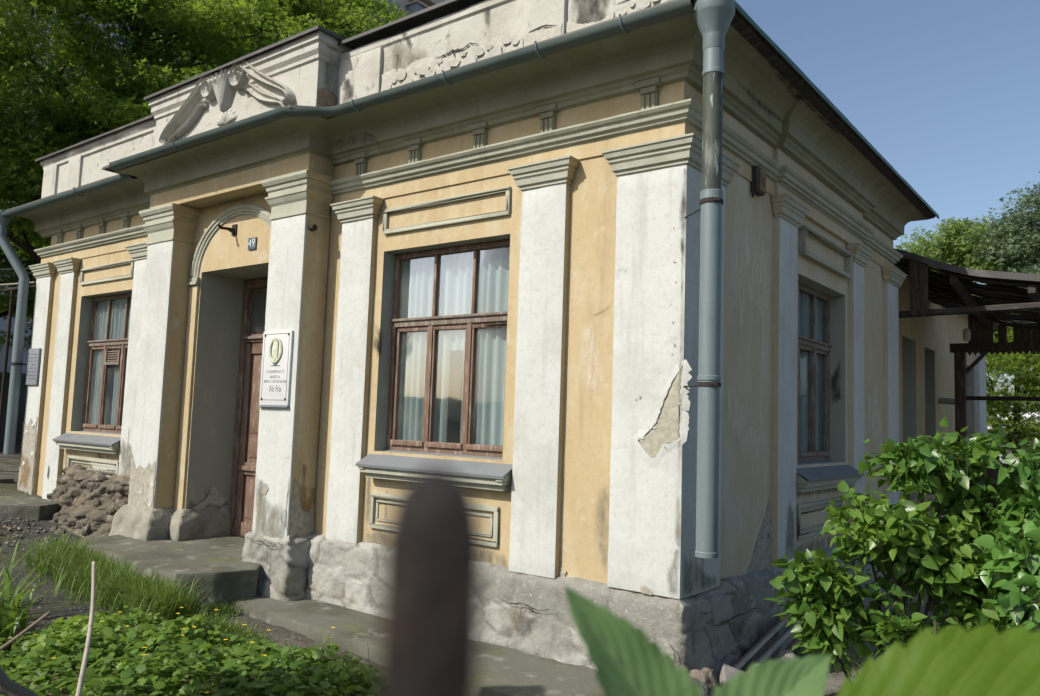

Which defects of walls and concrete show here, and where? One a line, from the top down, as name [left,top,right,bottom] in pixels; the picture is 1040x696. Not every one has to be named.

spalling [381,0,670,91]
water stain [575,0,606,24]
flaking render [318,88,336,107]
spalling [631,343,692,468]
peeling [18,417,37,494]
flaking render [47,454,156,542]
peeling [290,479,315,538]
crack [497,597,552,618]